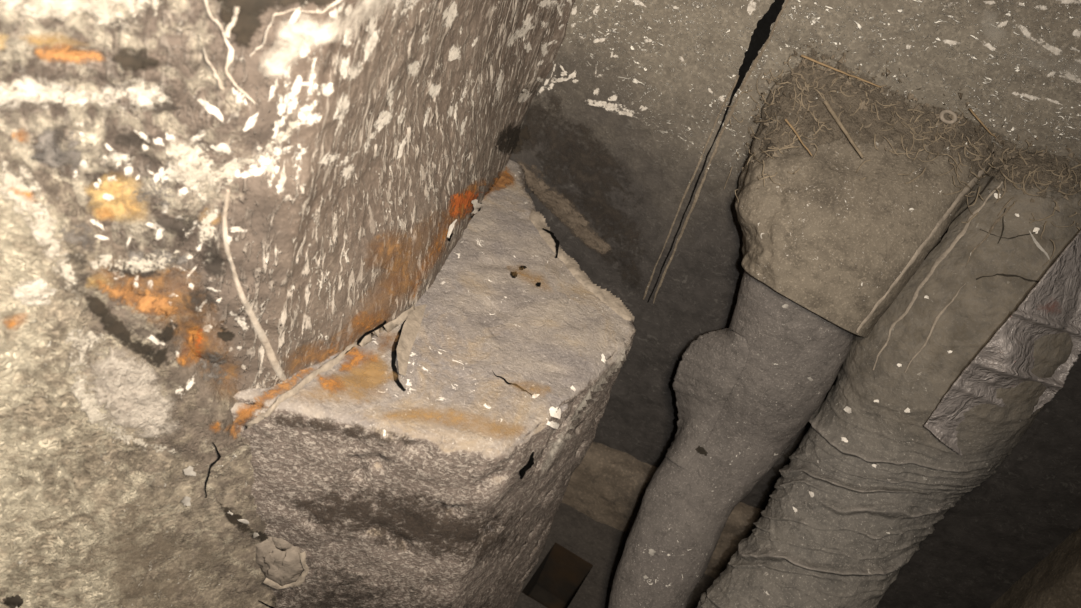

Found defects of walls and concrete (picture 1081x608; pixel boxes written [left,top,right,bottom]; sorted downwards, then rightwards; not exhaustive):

rust [31,39,102,63]
crack [643,0,789,304]
rust [89,179,140,219]
rust [372,167,513,297]
rust [91,268,217,365]
rust [212,309,393,437]
crack [391,320,406,391]
crack [493,372,532,395]
crack [205,442,221,498]